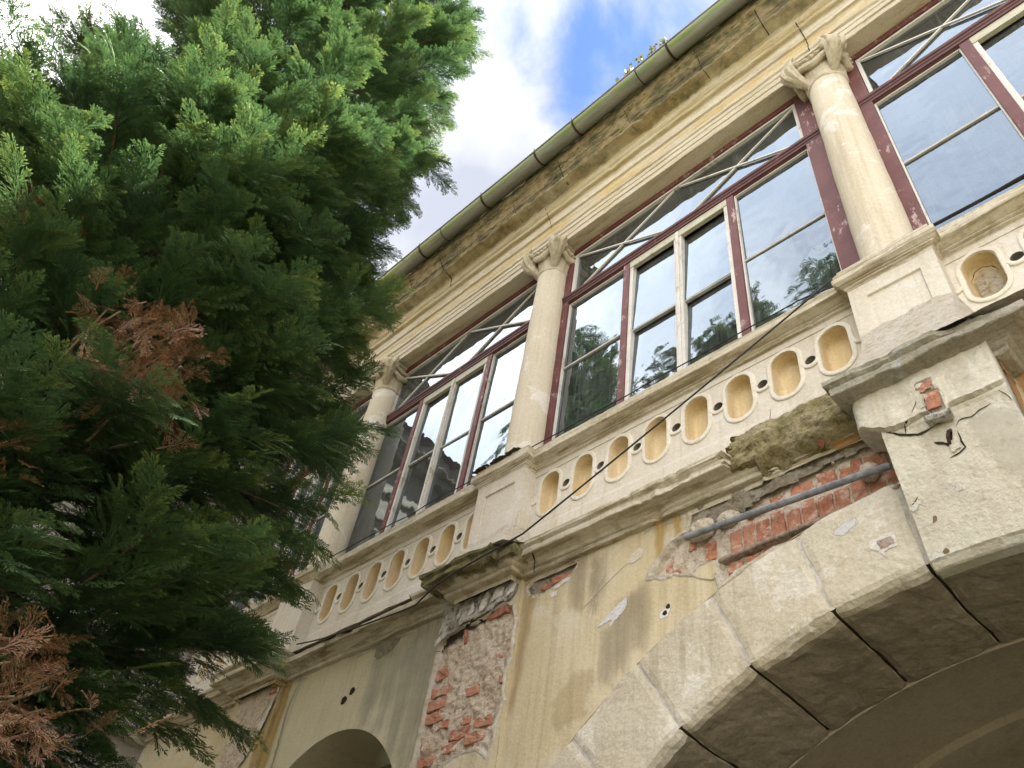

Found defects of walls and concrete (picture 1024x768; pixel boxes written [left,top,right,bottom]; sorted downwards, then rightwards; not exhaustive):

spalling [912,377,954,427]
crack [887,390,1011,436]
spalling [645,440,901,590]
spalling [409,560,579,768]